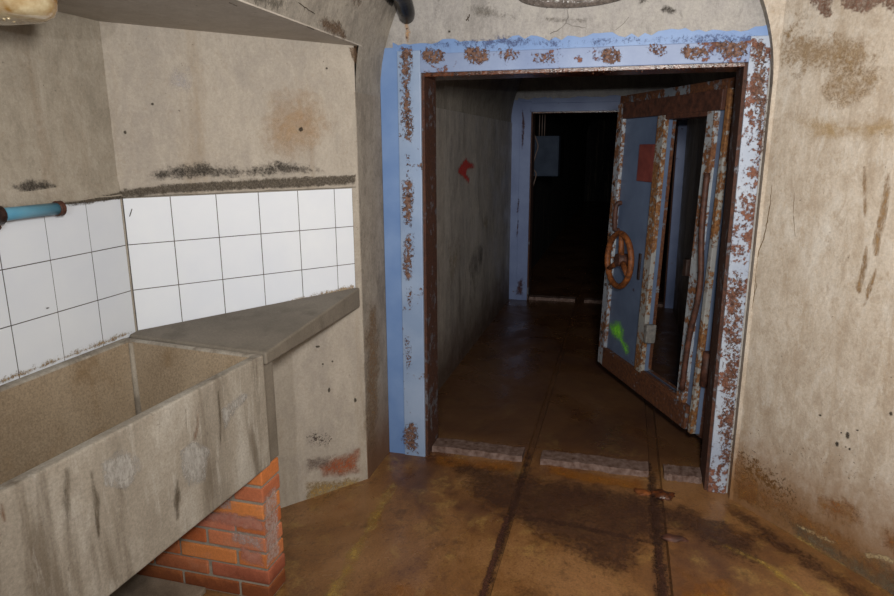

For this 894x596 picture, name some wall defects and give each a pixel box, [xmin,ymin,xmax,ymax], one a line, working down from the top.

rust [464,46,520,65]
rust [531,52,555,63]
rust [601,48,622,64]
water stain [782,30,877,103]
rust [398,28,446,143]
rust [681,40,768,162]
water stain [155,161,312,180]
rust [402,154,415,310]
rust [309,449,359,475]